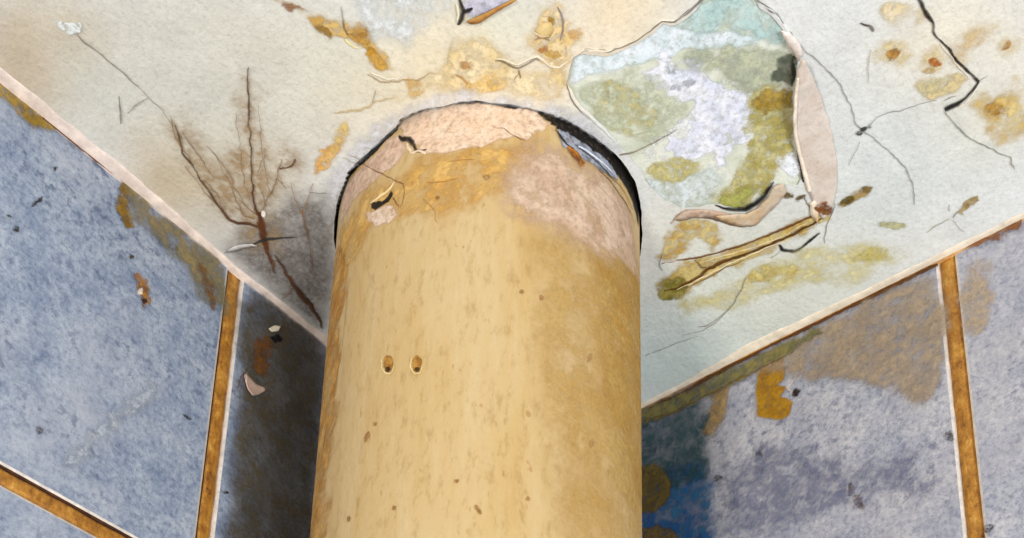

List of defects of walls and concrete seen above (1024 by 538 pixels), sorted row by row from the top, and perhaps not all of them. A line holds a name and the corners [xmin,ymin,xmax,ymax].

rust [283,3,389,70]
water stain [339,39,566,113]
peeling [566,0,837,243]
crack [803,0,1015,199]
crack [57,21,322,328]
peeling [341,103,633,221]
rust [134,272,151,308]
water stain [658,245,889,308]
water stain [760,279,950,402]
peeling [245,374,265,396]
rust [756,359,800,420]